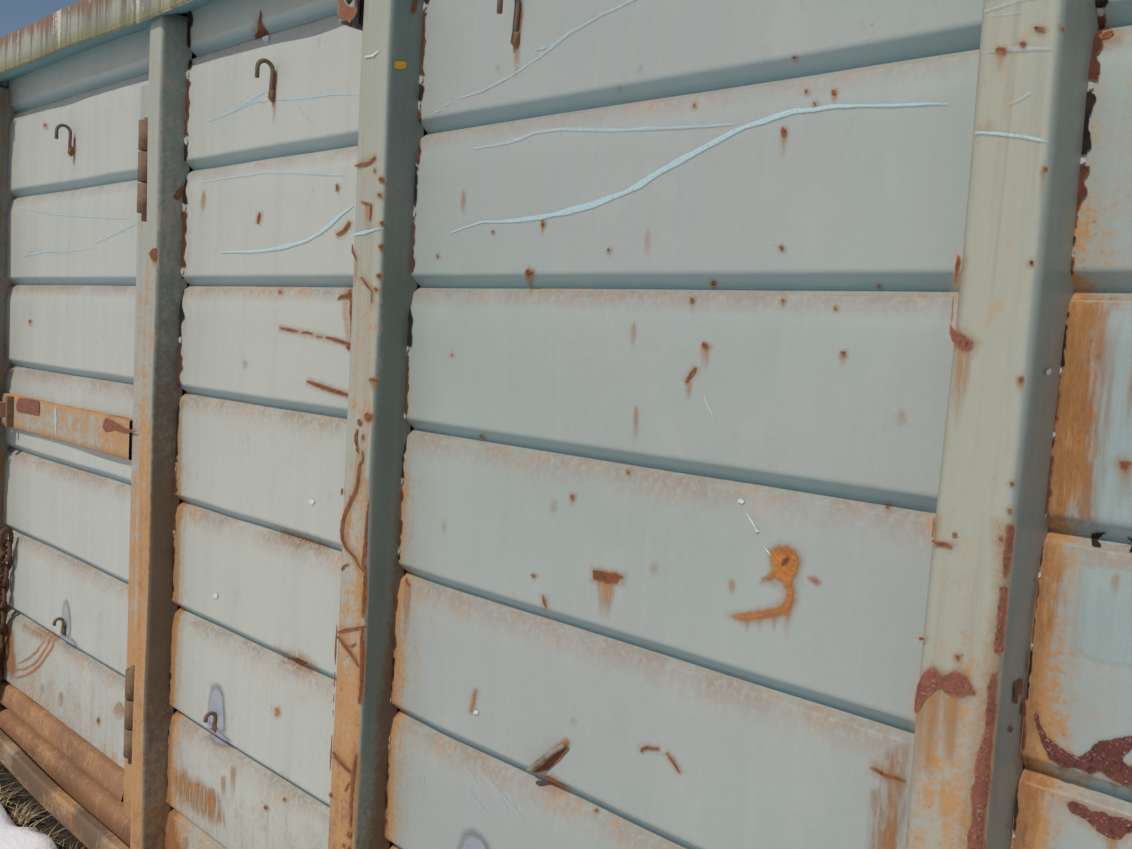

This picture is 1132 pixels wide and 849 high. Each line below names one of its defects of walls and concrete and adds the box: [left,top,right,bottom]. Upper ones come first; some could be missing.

rust [1049,302,1102,518]
rust [732,547,798,620]
rust [533,739,569,788]
rust [1034,713,1132,787]
rust [176,769,235,821]
rust [166,818,187,849]
rust [1067,801,1132,849]